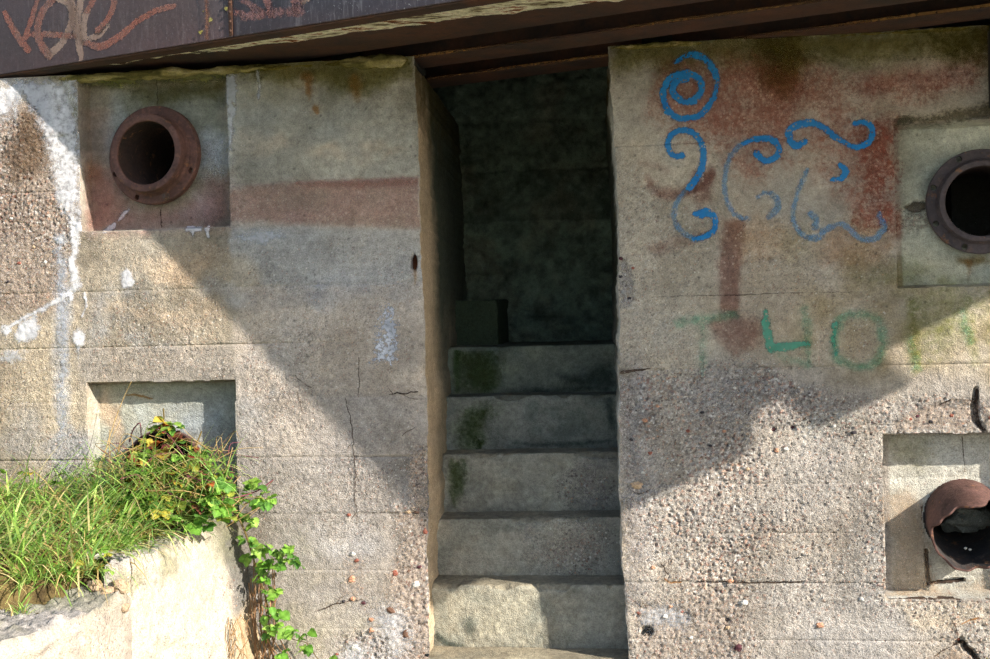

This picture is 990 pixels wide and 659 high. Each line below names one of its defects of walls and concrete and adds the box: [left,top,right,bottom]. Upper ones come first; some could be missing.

damp [0,76,87,398]
crack [345,360,360,525]
crack [931,389,986,472]
crack [889,548,990,659]